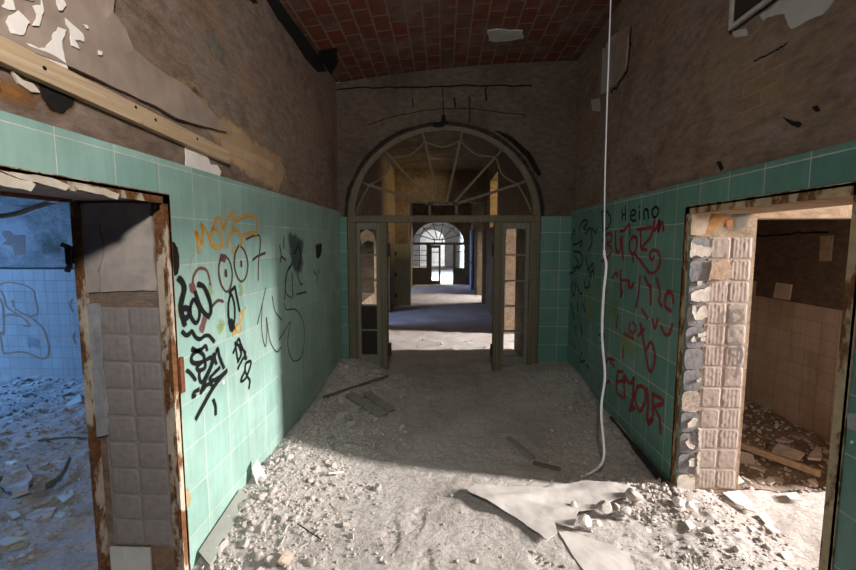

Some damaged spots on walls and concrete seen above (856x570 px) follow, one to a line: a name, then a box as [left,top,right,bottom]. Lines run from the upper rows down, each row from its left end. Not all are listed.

peeling [0,0,287,193]
peeling [732,28,747,38]
peeling [760,0,835,29]
peeling [0,170,174,546]
peeling [676,237,754,490]